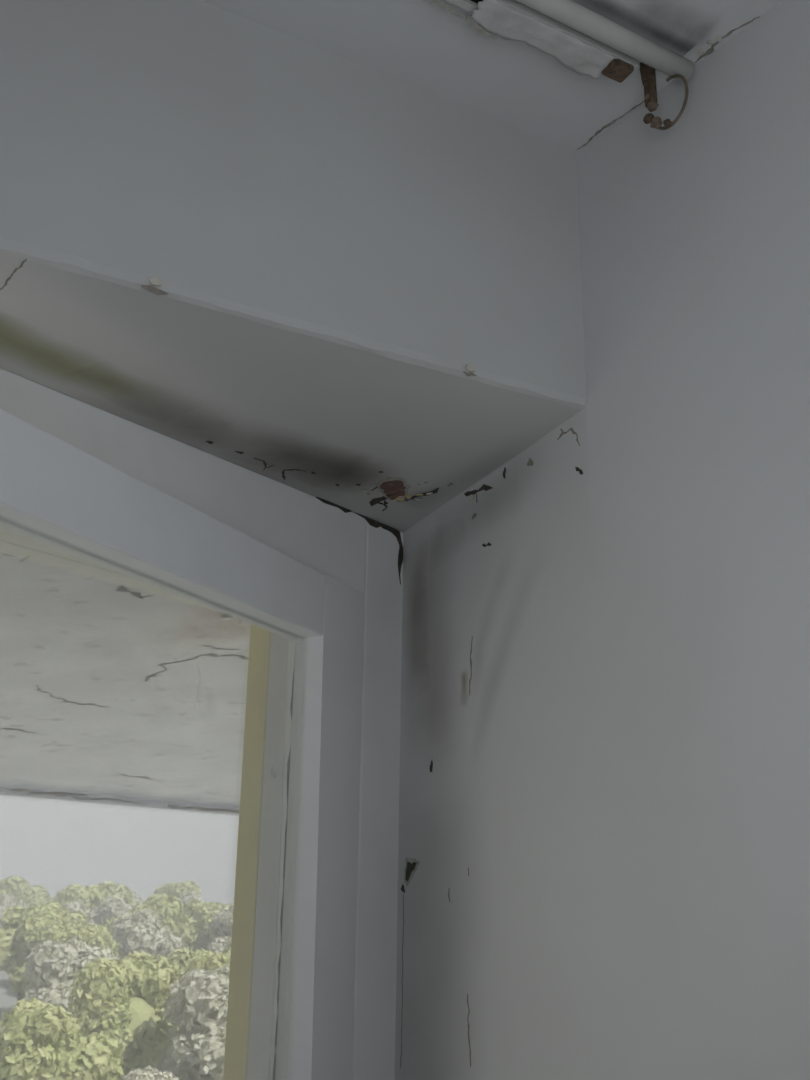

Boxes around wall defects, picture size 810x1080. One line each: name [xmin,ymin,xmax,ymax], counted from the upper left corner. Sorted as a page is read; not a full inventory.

crack [0,259,27,290]
spalling [361,471,433,511]
crack [397,484,492,502]
crack [316,496,403,585]
spalling [401,857,420,893]